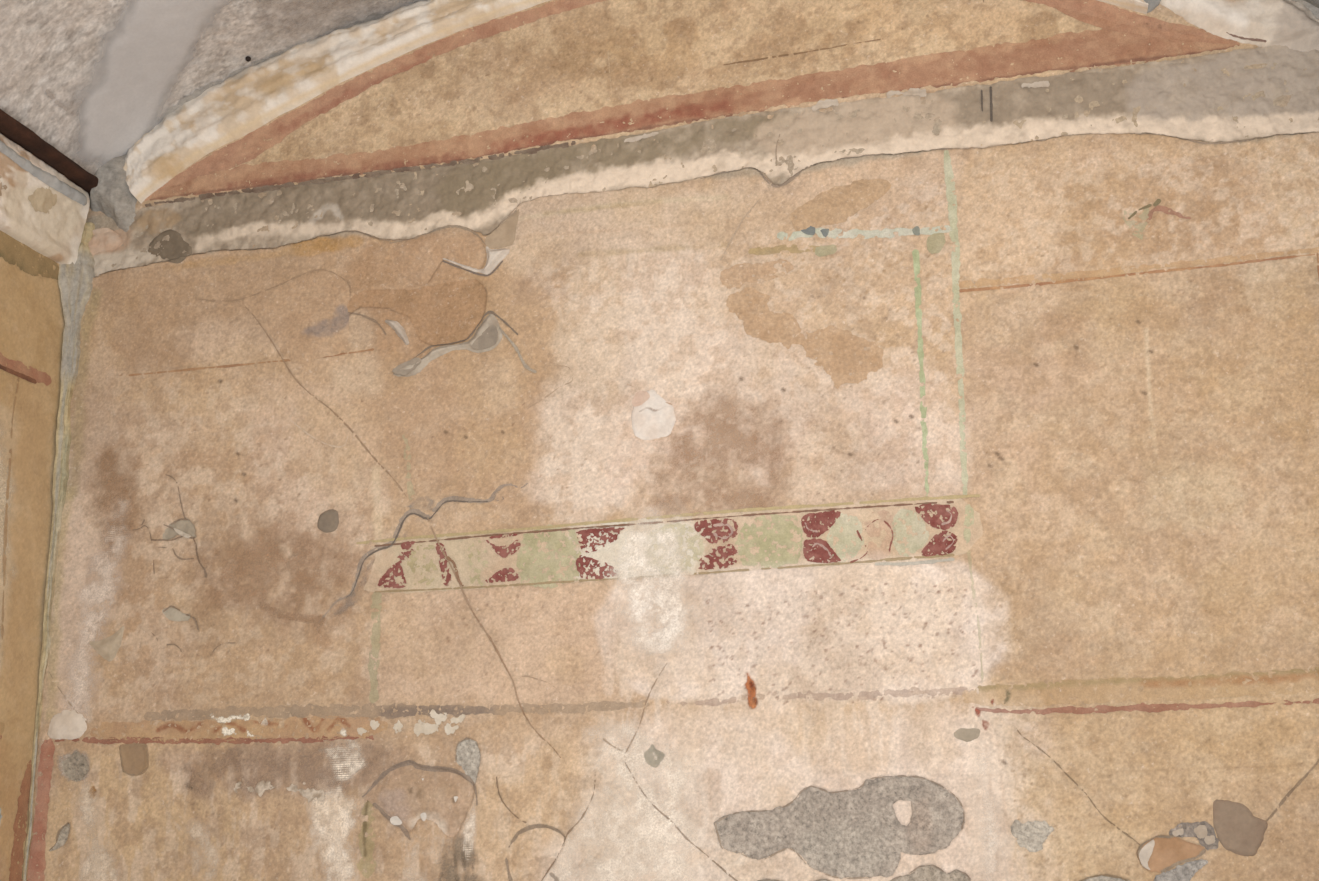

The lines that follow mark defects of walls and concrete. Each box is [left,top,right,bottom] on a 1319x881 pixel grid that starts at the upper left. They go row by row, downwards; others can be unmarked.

flaking render [93,45,1319,389]
crack [245,306,561,758]
crack [496,777,527,823]
crack [542,780,596,880]
crack [603,663,738,881]
flaking render [714,775,971,881]
crack [1017,730,1140,845]